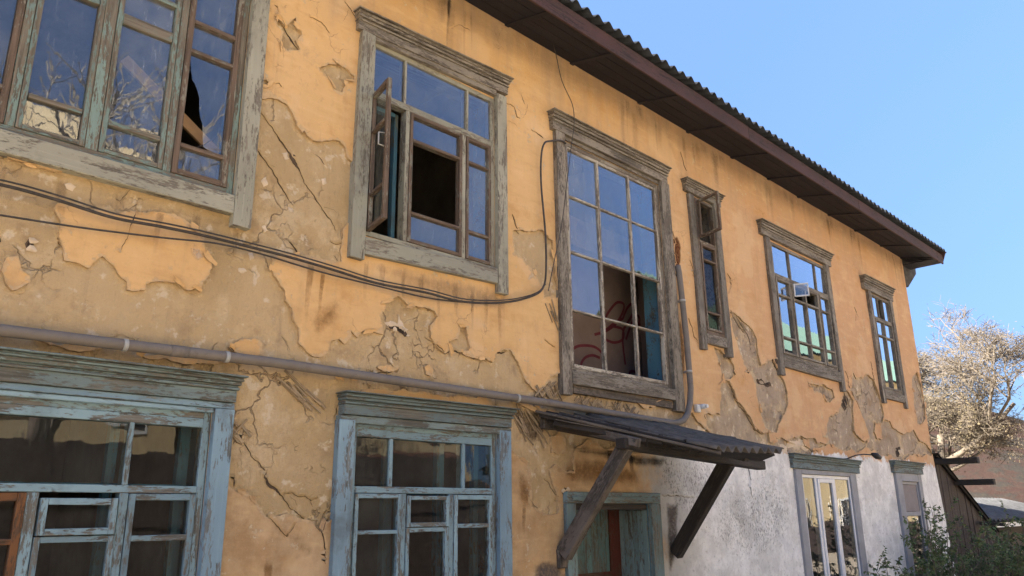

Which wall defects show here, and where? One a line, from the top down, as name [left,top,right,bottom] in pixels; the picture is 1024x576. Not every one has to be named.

flaking render [275,12,302,51]
flaking render [319,58,355,92]
crack [258,110,342,261]
flaking render [0,78,932,532]
crack [230,417,331,564]